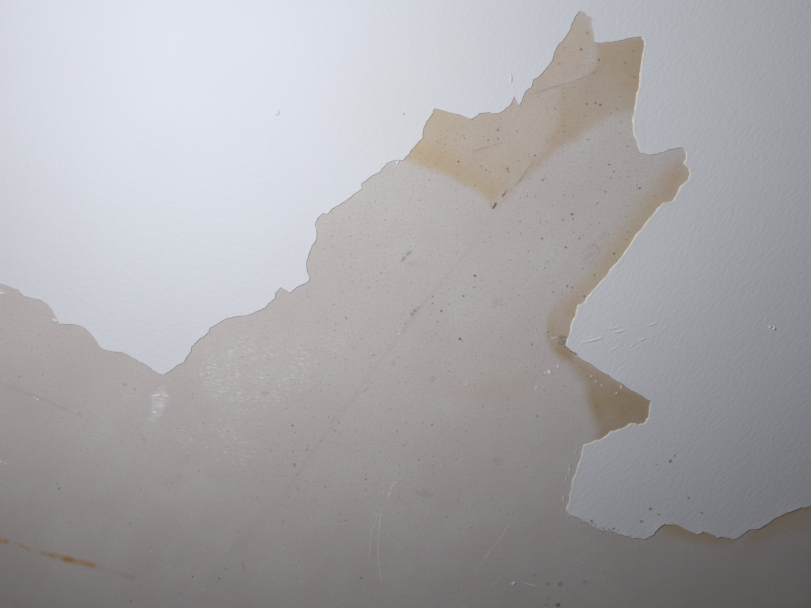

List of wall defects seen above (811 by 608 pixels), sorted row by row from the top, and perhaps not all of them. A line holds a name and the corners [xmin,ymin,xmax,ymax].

peeling [423,11,597,131]
damp [399,12,644,214]
peeling [632,36,646,153]
peeling [566,149,691,351]
peeling [571,401,652,491]
damp [648,507,811,552]